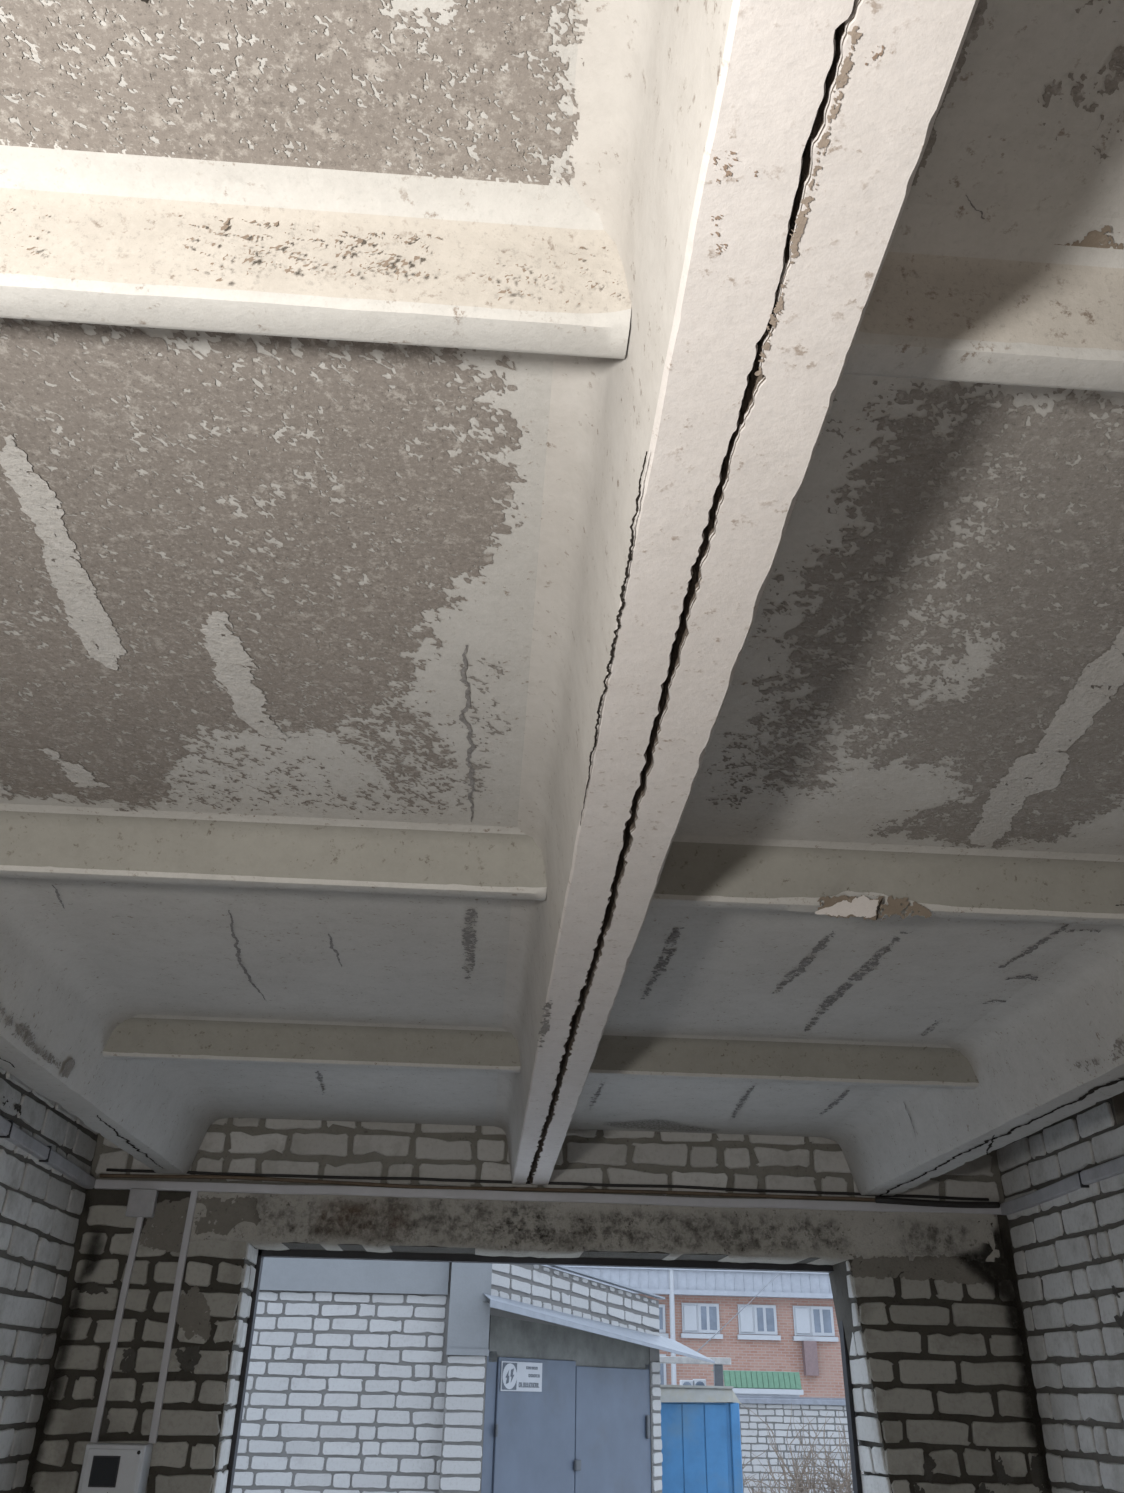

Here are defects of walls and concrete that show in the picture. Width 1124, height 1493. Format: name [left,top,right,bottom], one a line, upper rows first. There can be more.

peeling [0,0,589,185]
peeling [912,0,988,186]
spalling [1054,225,1124,250]
peeling [0,318,528,819]
crack [527,0,862,1184]
peeling [704,380,1124,850]
crack [459,645,476,822]
spalling [815,895,932,920]
water stain [406,1207,832,1249]
crack [879,1078,1124,1196]